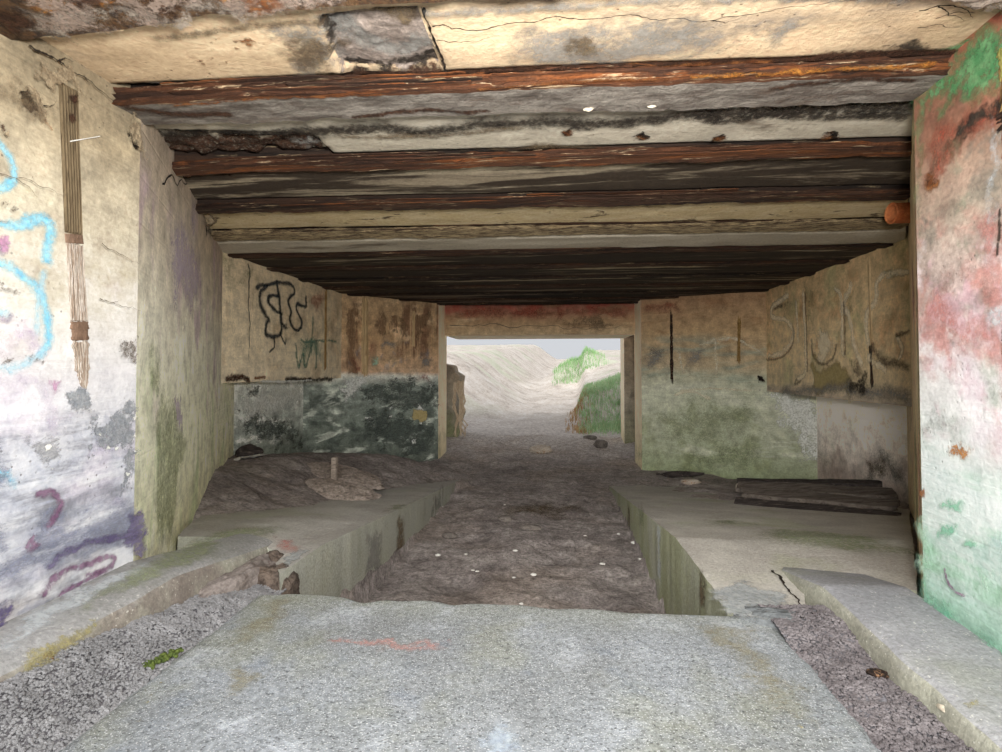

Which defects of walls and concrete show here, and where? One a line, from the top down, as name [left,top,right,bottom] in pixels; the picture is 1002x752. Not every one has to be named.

spalling [319,6,442,73]
crack [422,0,857,72]
crack [918,5,993,28]
spalling [951,0,1002,11]
crack [771,570,813,614]